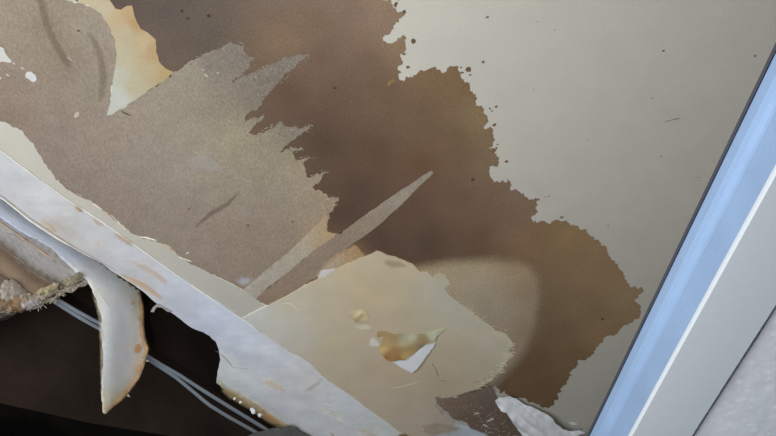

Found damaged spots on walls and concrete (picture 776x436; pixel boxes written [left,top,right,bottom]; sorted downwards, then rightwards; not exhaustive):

peeling [0,0,339,292]
leakage [110,0,643,408]
peeling [436,386,522,436]